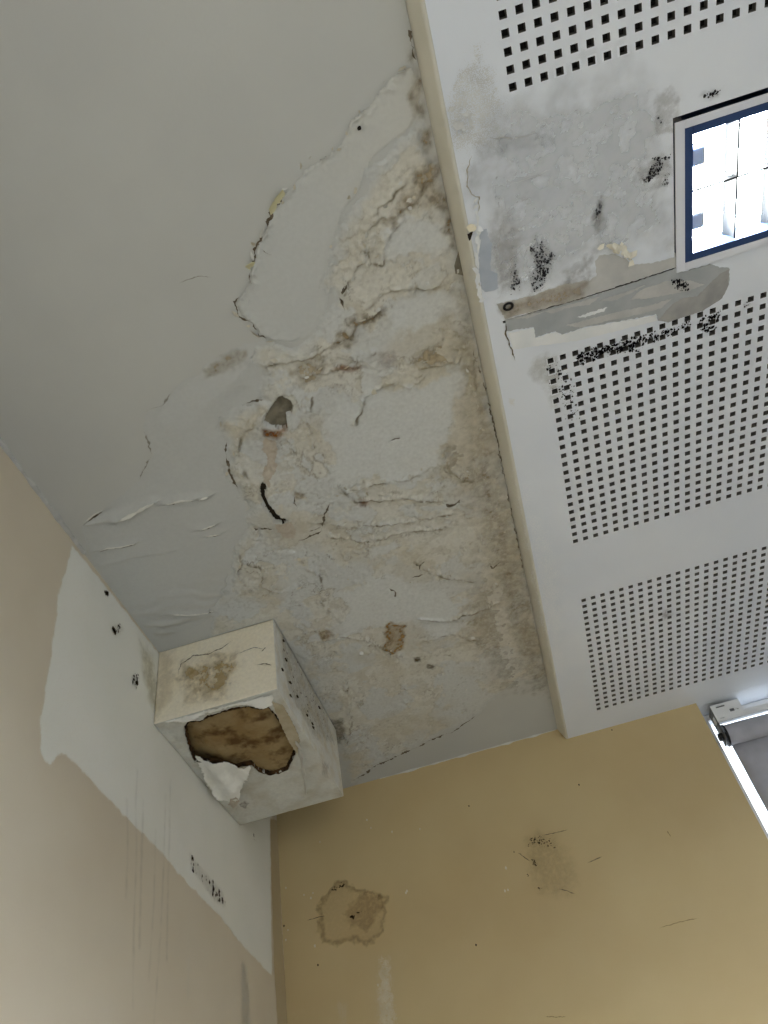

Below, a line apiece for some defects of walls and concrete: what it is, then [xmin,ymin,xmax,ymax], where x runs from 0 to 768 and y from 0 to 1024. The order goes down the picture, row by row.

mould [643,154,671,185]
crack [233,192,287,340]
mould [510,235,555,295]
mould [576,311,721,366]
flaking render [166,66,548,784]
crack [224,443,329,541]
damp [185,661,233,691]
crack [178,644,270,672]
damp [281,639,344,738]
damp [384,623,406,655]